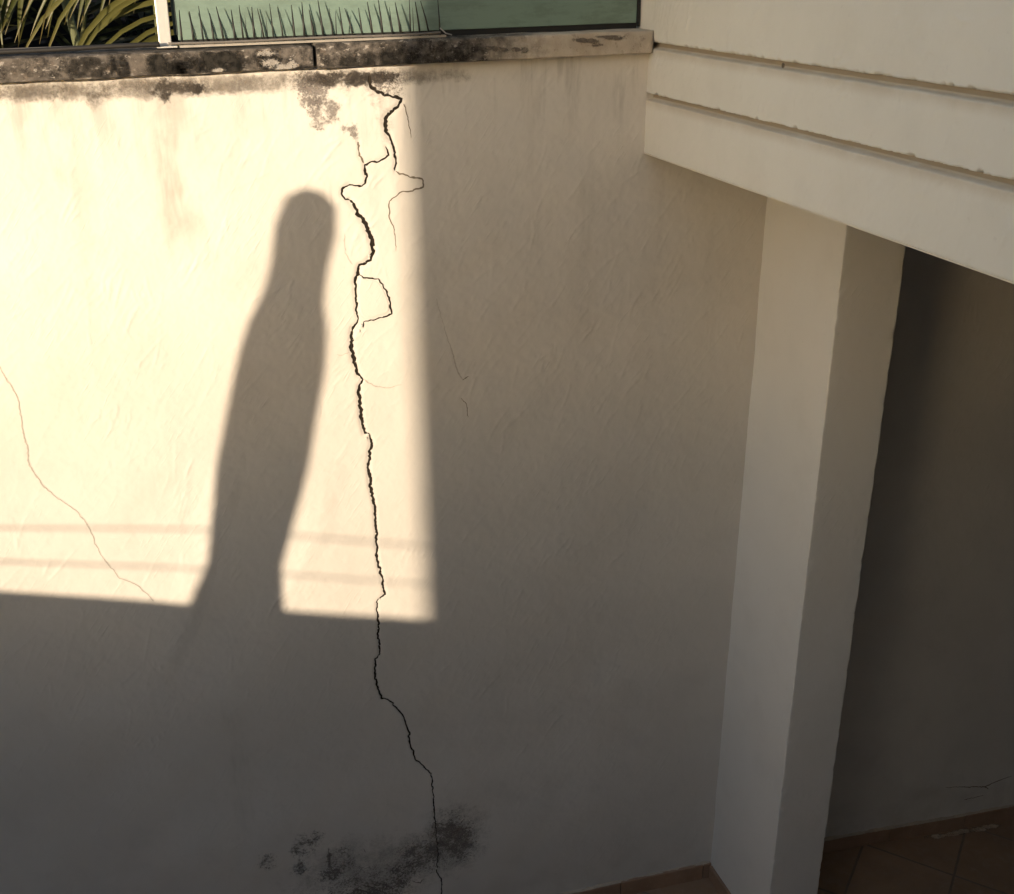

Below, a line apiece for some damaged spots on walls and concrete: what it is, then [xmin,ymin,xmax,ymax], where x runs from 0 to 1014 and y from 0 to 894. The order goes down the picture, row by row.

crack [0,367,154,601]
crack [339,76,443,894]
water stain [321,812,477,894]